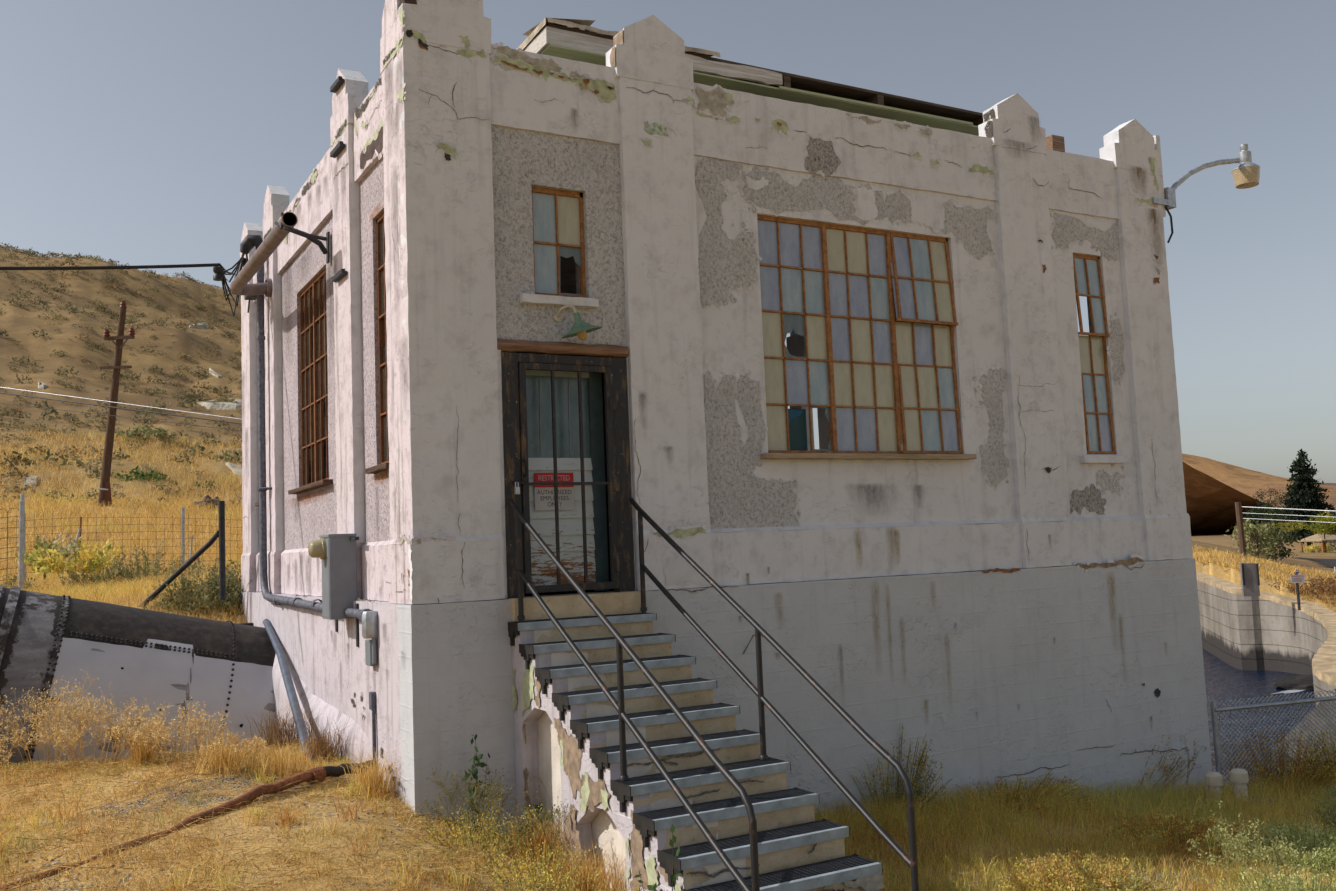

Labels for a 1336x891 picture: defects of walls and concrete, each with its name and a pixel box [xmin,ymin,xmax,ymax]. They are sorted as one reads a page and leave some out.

spalling [332,6,431,172]
peeling [455,29,623,105]
peeling [678,84,791,135]
peeling [845,113,941,169]
spalling [695,137,996,311]
spalling [1038,210,1120,273]
spalling [651,371,801,541]
spalling [973,365,1010,490]
spalling [1069,463,1125,517]
peeling [512,664,541,744]
peeling [554,718,610,871]
peeling [625,809,682,891]